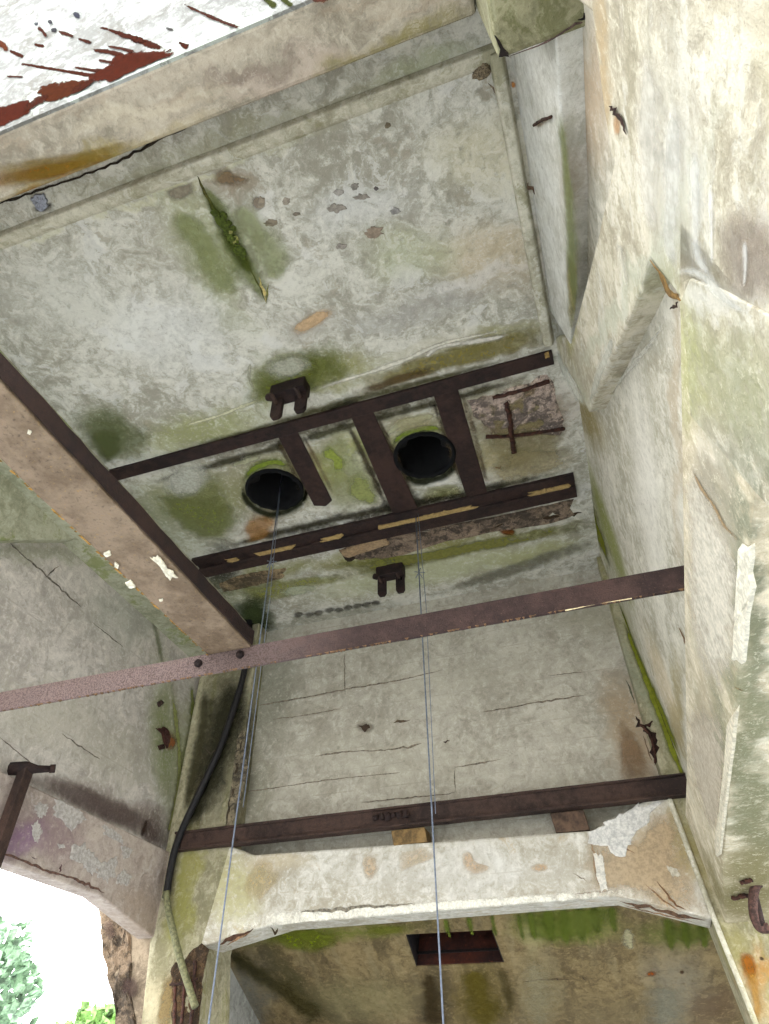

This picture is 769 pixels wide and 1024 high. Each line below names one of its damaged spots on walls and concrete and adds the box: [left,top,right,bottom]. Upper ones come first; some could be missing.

corrosion [184,4,238,28]
corrosion [0,26,189,126]
crack [0,128,187,204]
crack [177,176,282,303]
mould [91,419,145,460]
spalling [467,374,565,480]
damp [186,687,243,824]
flaking render [271,801,691,924]
damp [624,930,633,948]
crack [620,901,702,922]
spalling [158,943,209,1024]
corrosion [742,954,764,1014]